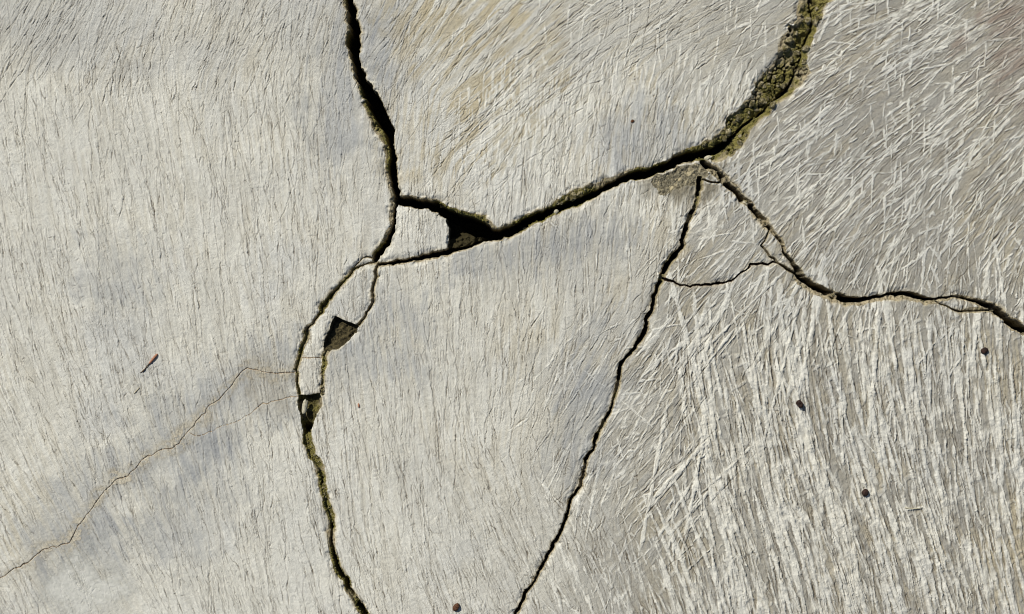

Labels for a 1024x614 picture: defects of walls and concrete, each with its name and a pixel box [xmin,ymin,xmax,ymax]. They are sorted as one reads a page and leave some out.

crack [0,0,470,579]
crack [300,411,370,614]
crack [400,0,1024,614]